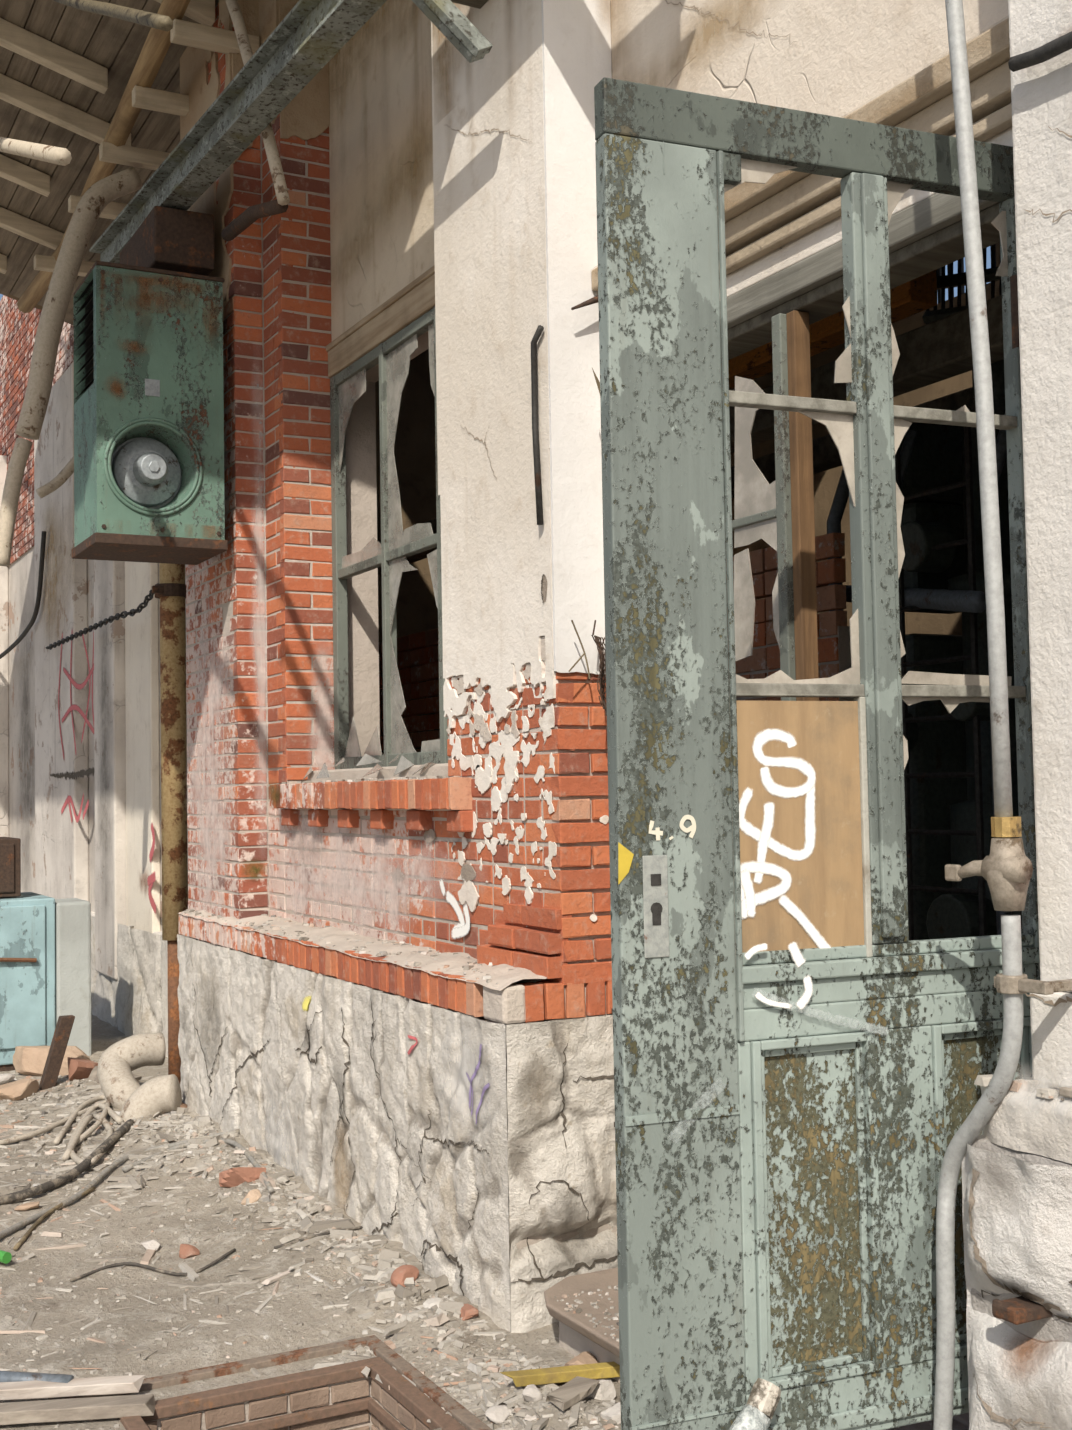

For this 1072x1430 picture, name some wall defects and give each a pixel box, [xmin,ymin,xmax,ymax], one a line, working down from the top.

peeling [212,0,299,46]
crack [665,0,797,44]
peeling [180,46,244,141]
peeling [271,62,330,141]
crack [447,112,531,142]
peeling [187,142,253,344]
crack [1024,209,1072,223]
peeling [446,636,557,912]
crack [192,983,489,1296]
crack [511,1043,618,1284]
crack [968,1168,1072,1323]
crack [972,1373,1050,1430]